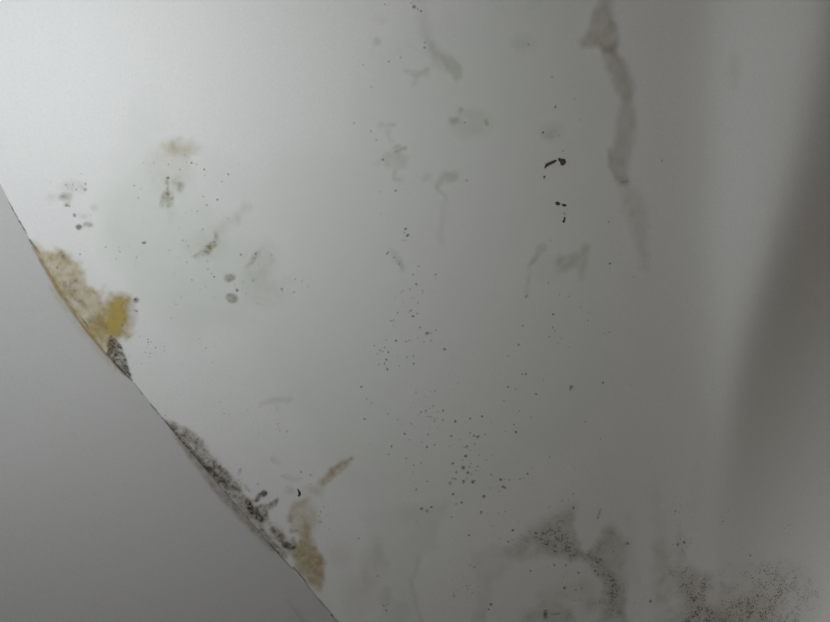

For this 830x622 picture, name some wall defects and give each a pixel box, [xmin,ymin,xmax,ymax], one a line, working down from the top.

damp [108,339,131,376]
damp [172,424,296,553]